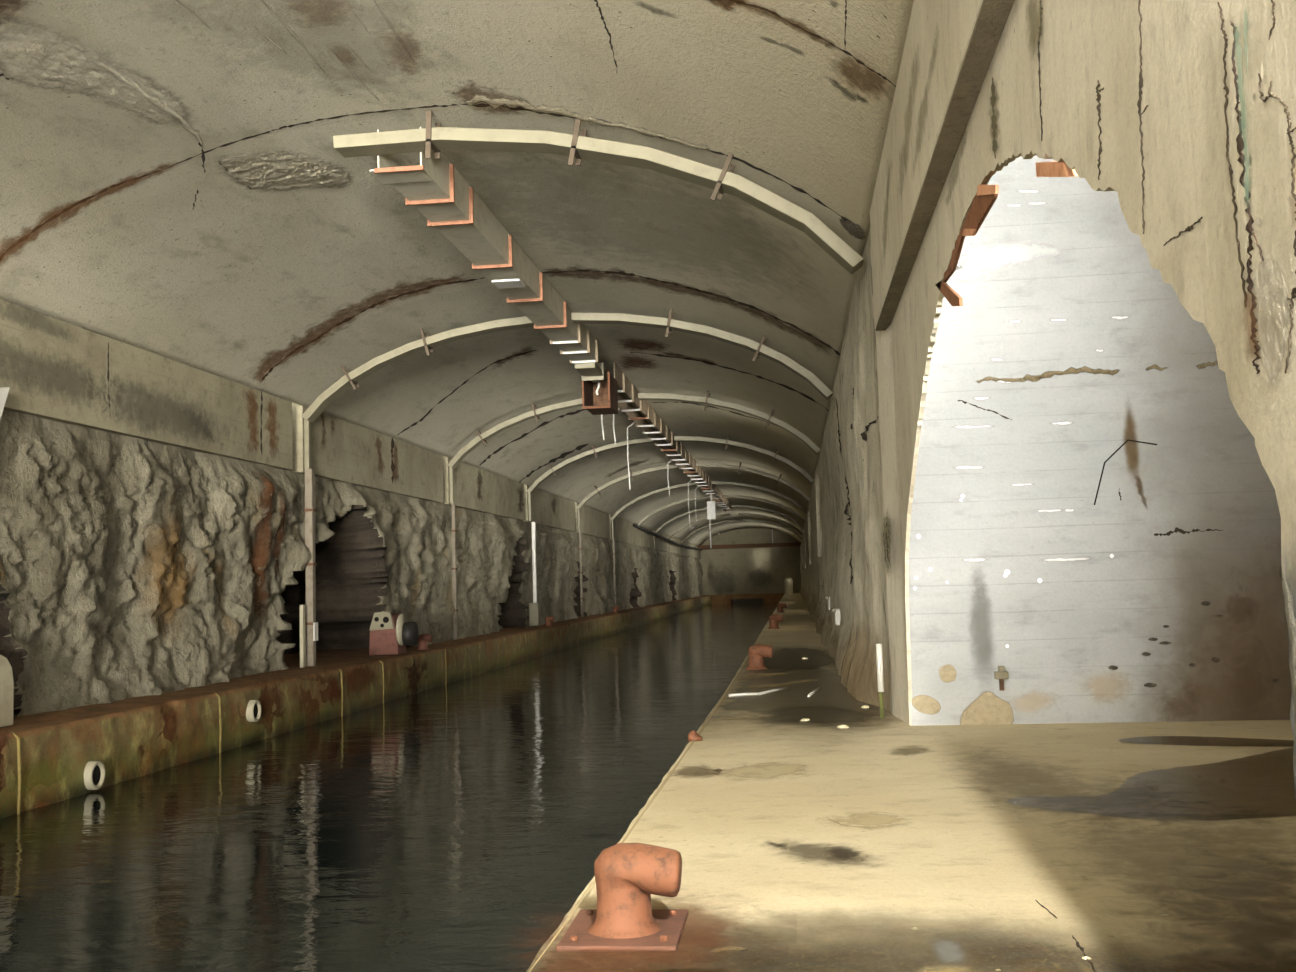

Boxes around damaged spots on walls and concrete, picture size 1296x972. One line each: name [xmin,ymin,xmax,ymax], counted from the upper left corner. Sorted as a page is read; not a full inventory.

crack [1096,80,1104,180]
rust [0,164,169,263]
crack [2,103,621,257]
crack [706,149,861,229]
crack [1137,0,1296,374]
rust [247,277,464,449]
spalling [977,366,1119,383]
rust [377,438,398,479]
rust [260,685,282,731]
peeling [912,695,941,714]
peeling [939,665,957,682]
peeling [960,691,1014,725]